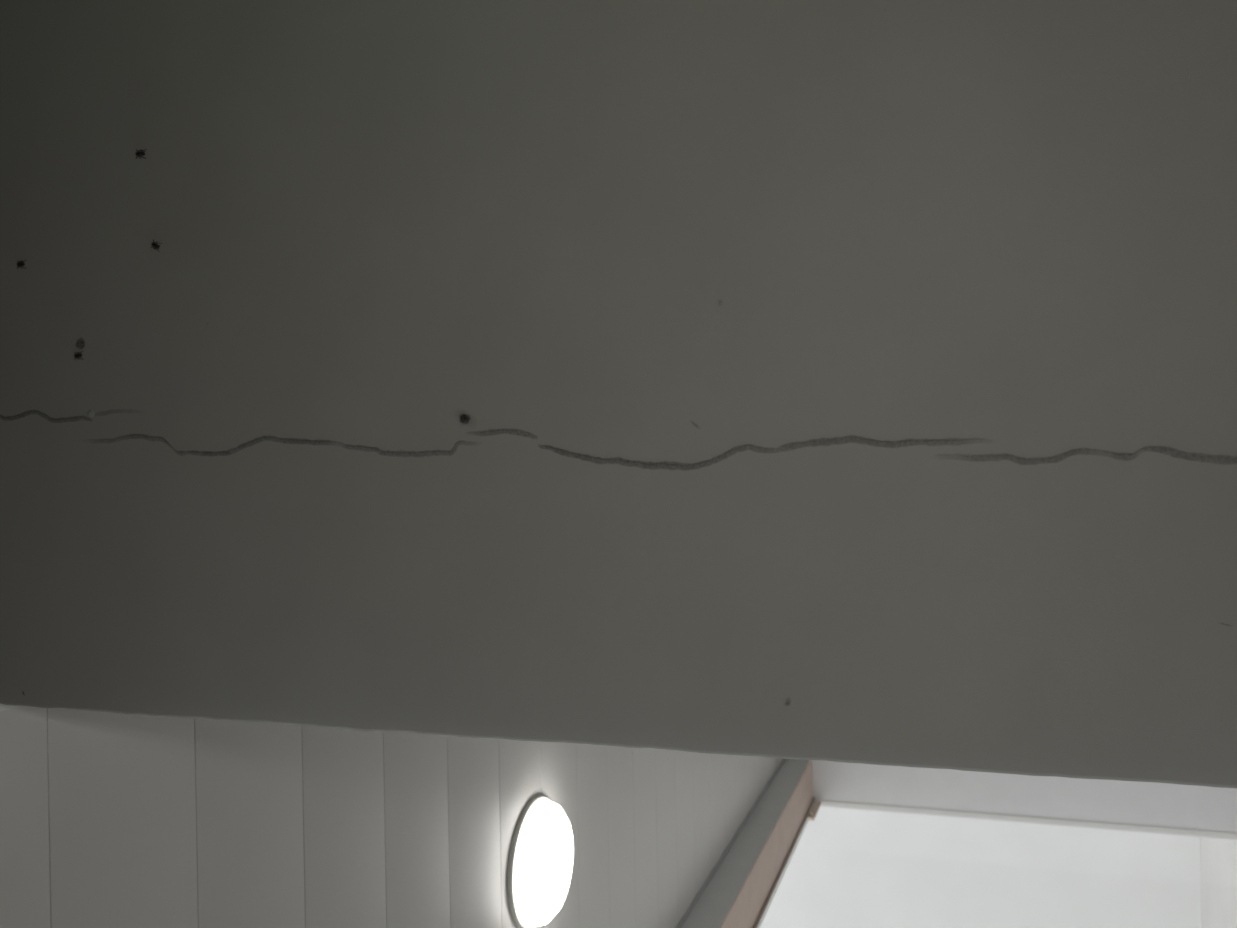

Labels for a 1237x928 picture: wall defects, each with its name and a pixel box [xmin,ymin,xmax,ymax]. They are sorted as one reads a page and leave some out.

crack [546,446,726,469]